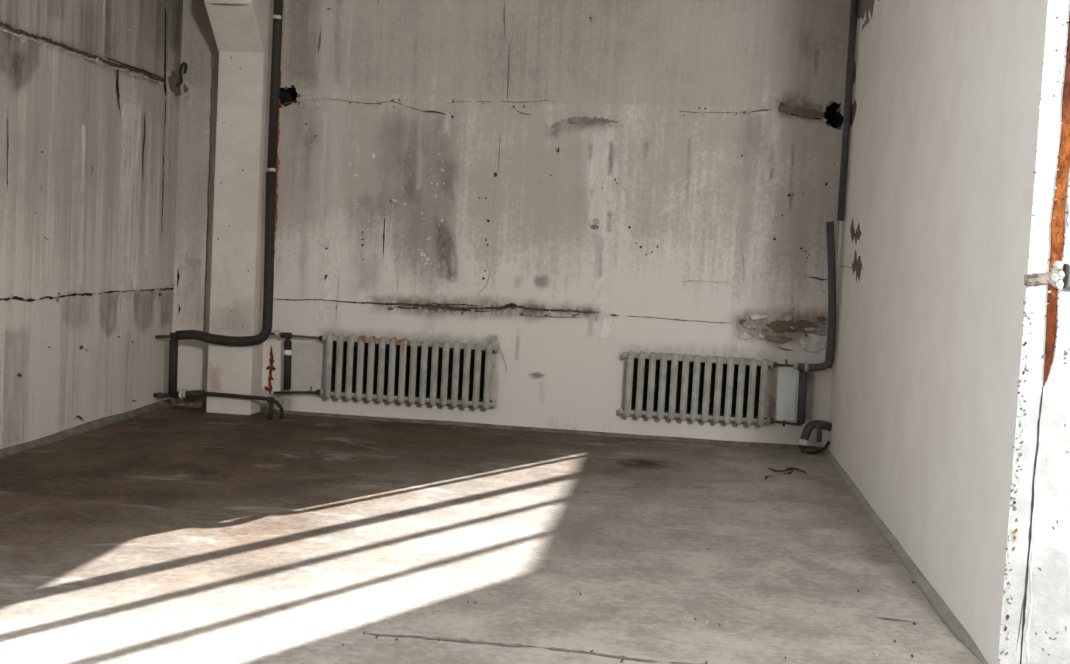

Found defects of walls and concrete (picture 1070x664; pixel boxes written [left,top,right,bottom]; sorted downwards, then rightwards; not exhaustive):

spalling [856,0,880,30]
crack [0,0,167,230]
spalling [779,95,857,128]
crack [0,55,213,332]
spalling [850,217,862,282]
crack [276,299,726,323]
spalling [737,314,827,353]
corrosion [265,346,276,395]